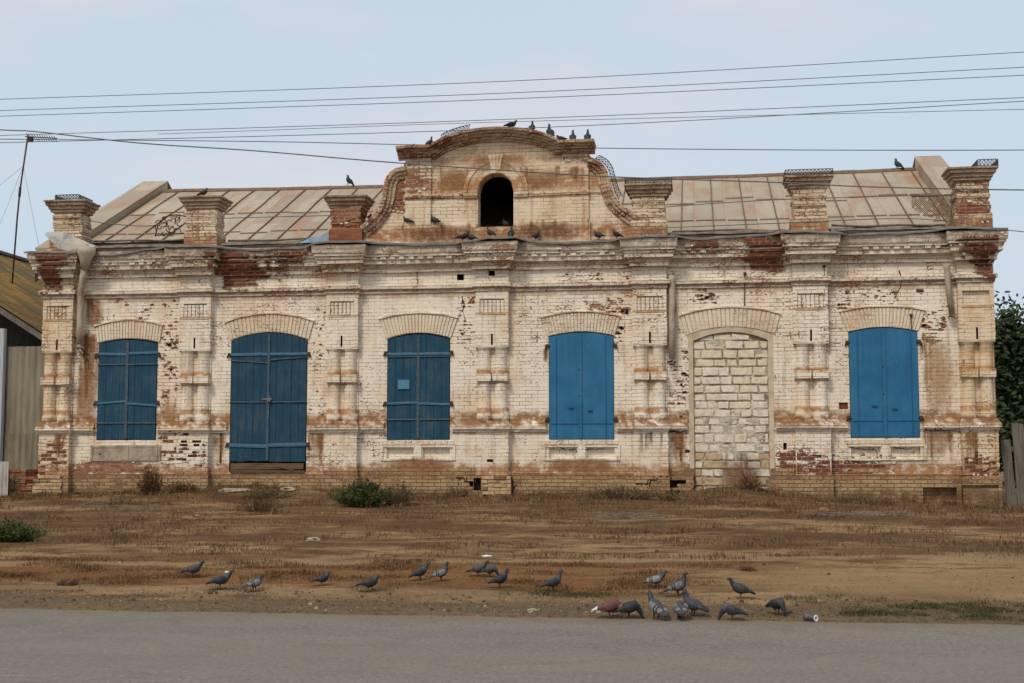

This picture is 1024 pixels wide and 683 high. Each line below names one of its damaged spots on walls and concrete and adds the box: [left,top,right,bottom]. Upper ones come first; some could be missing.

peeling [391,163,432,213]
peeling [34,250,73,295]
peeling [202,245,312,292]
peeling [690,240,719,254]
peeling [741,229,790,275]
peeling [955,199,1008,282]
peeling [38,298,208,475]
peeling [775,448,896,475]
peeling [957,454,1003,476]